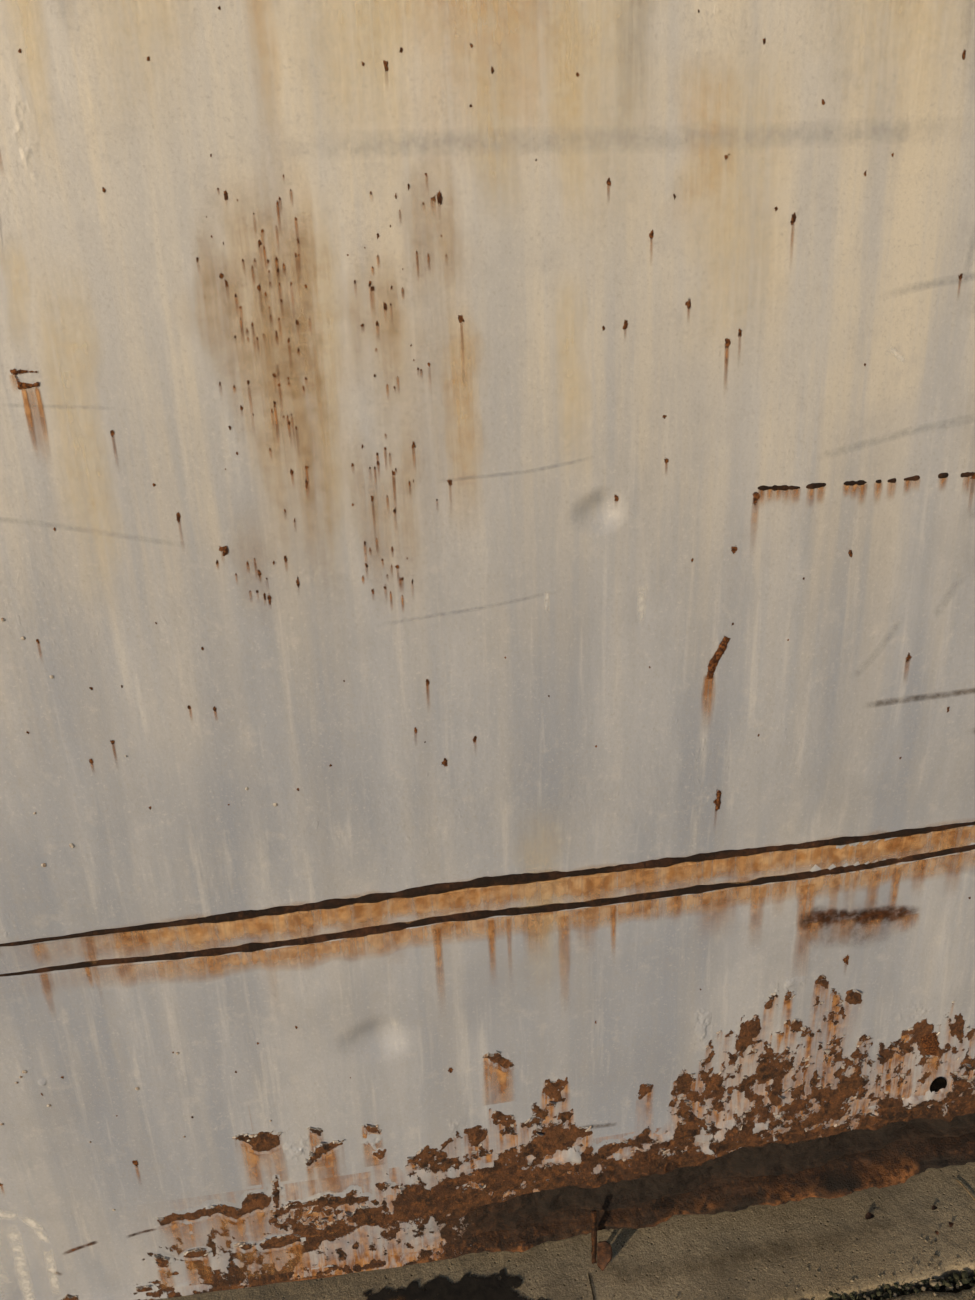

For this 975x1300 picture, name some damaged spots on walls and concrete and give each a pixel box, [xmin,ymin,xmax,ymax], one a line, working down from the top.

corrosion [219,174,310,430]
corrosion [354,225,404,327]
corrosion [10,368,45,432]
corrosion [351,433,414,513]
corrosion [753,483,826,504]
corrosion [844,475,920,495]
corrosion [938,472,975,484]
corrosion [235,556,287,604]
corrosion [116,825,975,971]
corrosion [921,1032,940,1069]
peeling [131,969,975,1293]
peeling [55,1292,84,1300]